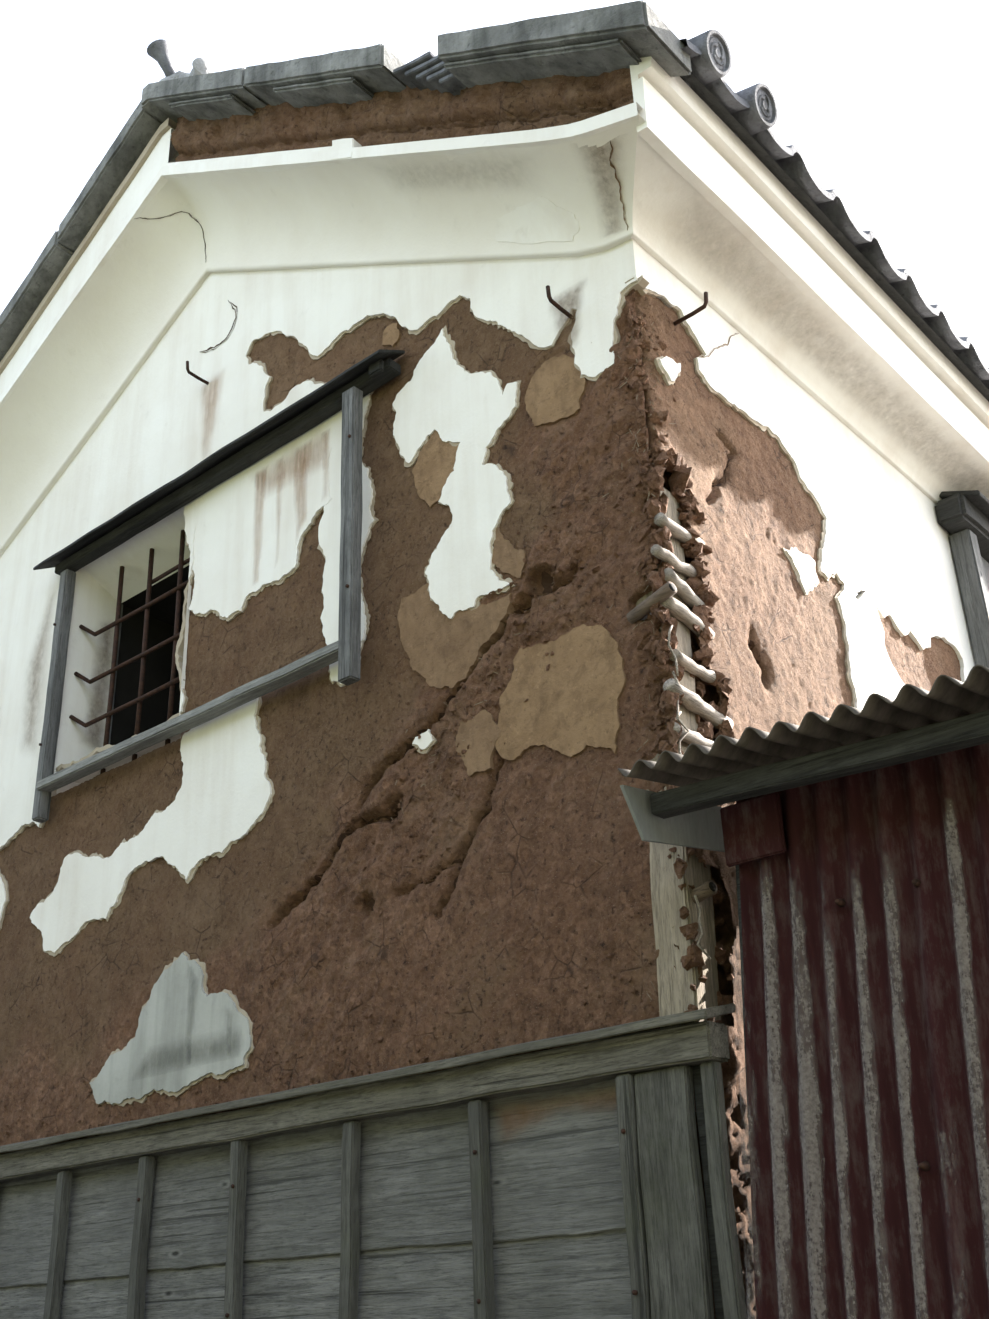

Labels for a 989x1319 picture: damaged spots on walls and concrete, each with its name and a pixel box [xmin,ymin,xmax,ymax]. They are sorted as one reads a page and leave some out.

crack [609,141,628,230]
crack [135,211,206,259]
crack [201,300,237,353]
spalling [880,616,961,691]
crack [392,687,461,765]
spalling [0,289,856,1319]
crack [480,769,501,823]
crack [303,815,398,901]
crack [413,854,464,890]
peeling [945,800,989,1289]
peeling [852,879,893,1319]
peeling [883,865,927,1319]